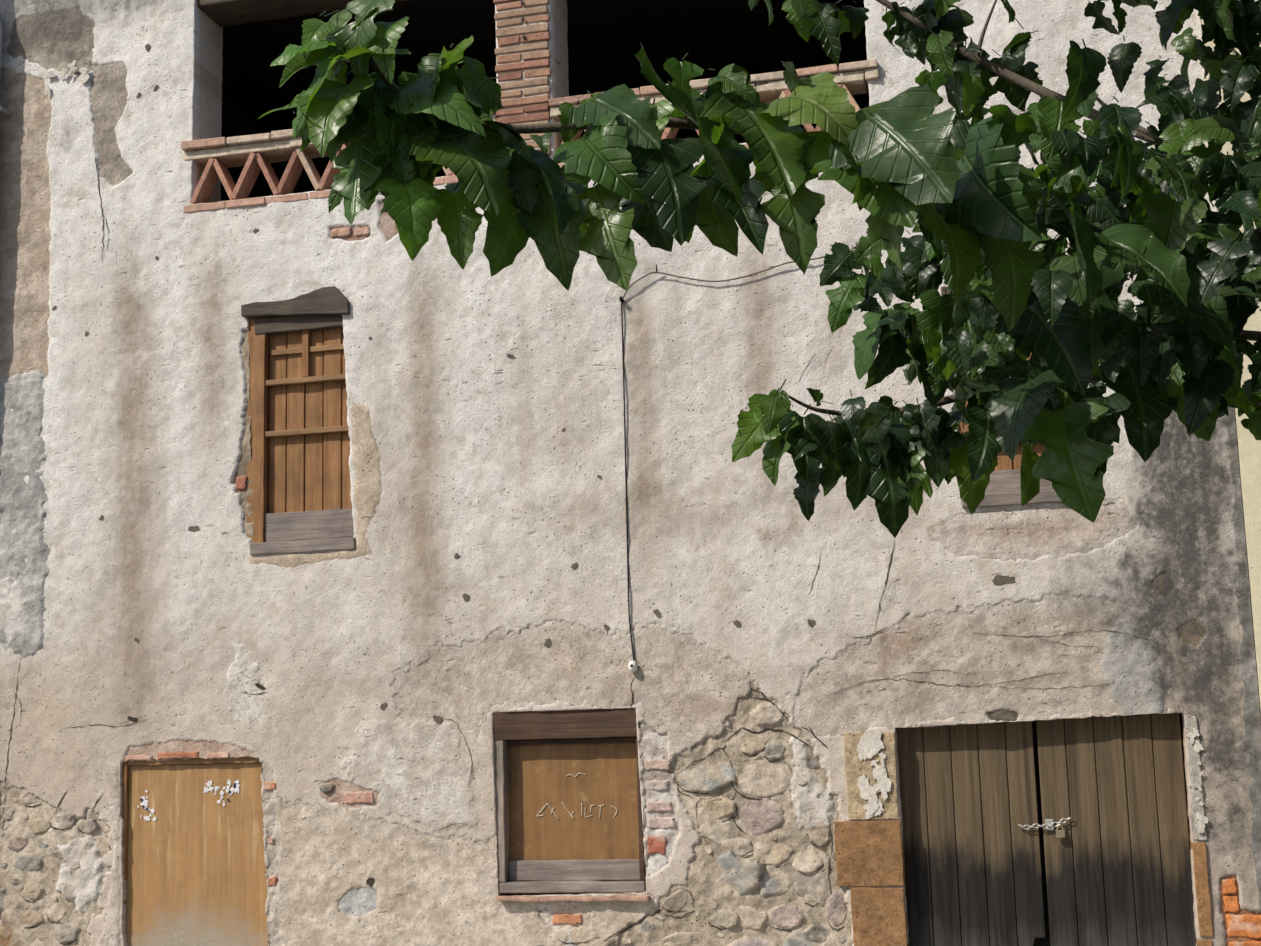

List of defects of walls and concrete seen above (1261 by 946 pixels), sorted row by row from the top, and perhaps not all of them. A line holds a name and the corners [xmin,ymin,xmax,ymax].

peeling [0,8,159,379]
crack [2,653,22,817]
peeling [123,740,655,946]
peeling [380,609,760,876]
crack [846,549,905,645]
peeling [788,591,1135,819]
crack [824,630,1159,696]
peeling [927,498,1137,585]
damp [1115,407,1257,856]
flaking render [1220,875,1261,946]